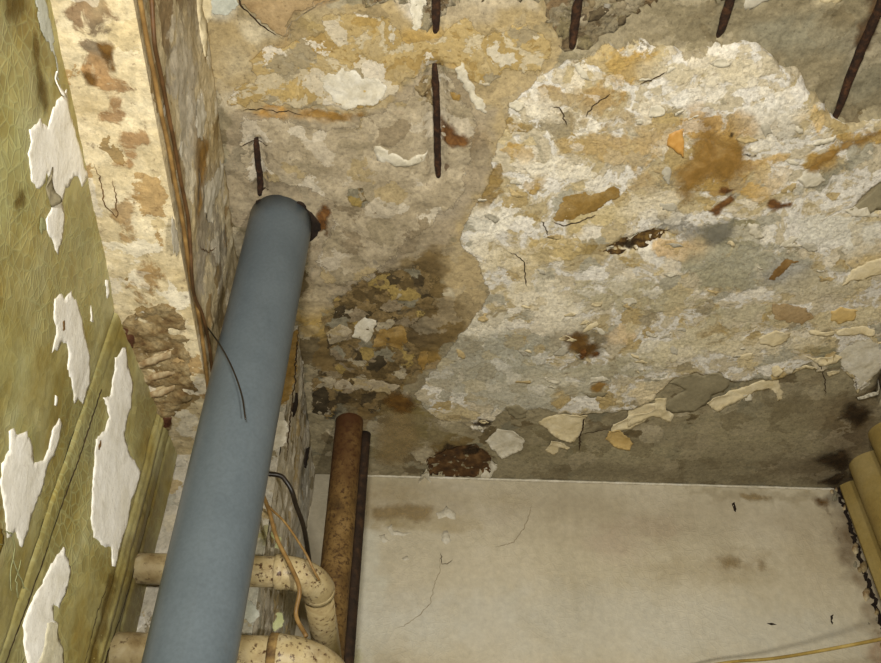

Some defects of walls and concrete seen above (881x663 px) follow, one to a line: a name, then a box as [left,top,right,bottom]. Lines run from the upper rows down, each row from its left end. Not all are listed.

crack [239,0,331,39]
corrosion [440,117,469,147]
peeling [227,0,881,479]
damp [678,131,756,216]
damp [767,199,792,210]
peeling [52,291,94,404]
damp [310,264,440,464]
peeling [0,418,63,547]
peeling [91,303,198,567]
corrosion [426,444,494,477]
damp [818,450,849,485]
peeling [22,547,71,663]